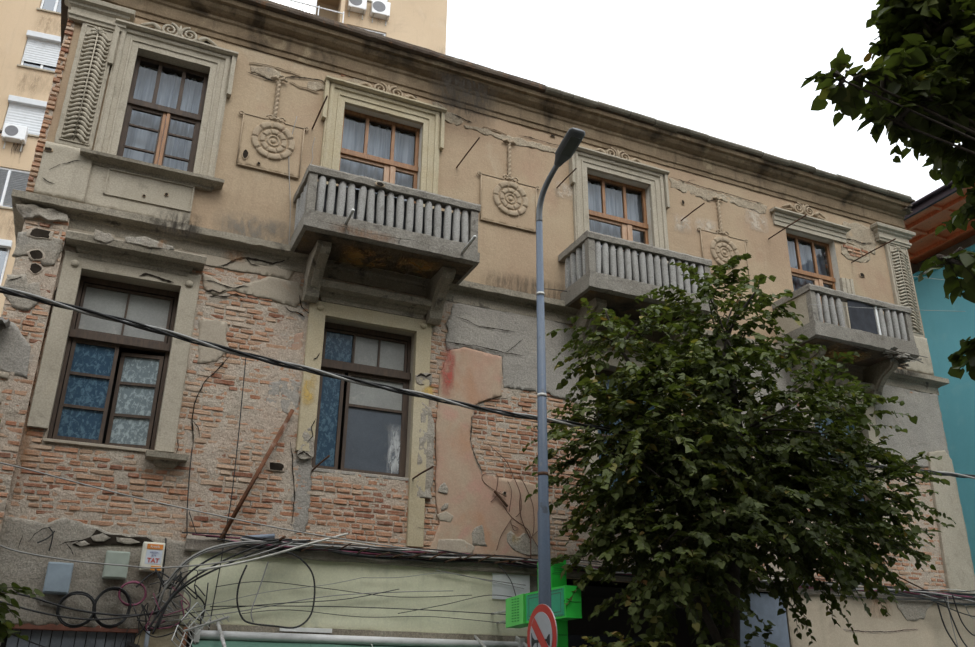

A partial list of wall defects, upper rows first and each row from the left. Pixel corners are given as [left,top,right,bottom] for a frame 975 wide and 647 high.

peeling [3,204,68,311]
crack [205,257,285,298]
peeling [202,272,303,308]
peeling [0,321,31,379]
peeling [197,317,229,364]
crack [442,315,524,356]
spalling [266,461,287,472]
peeling [429,347,570,559]